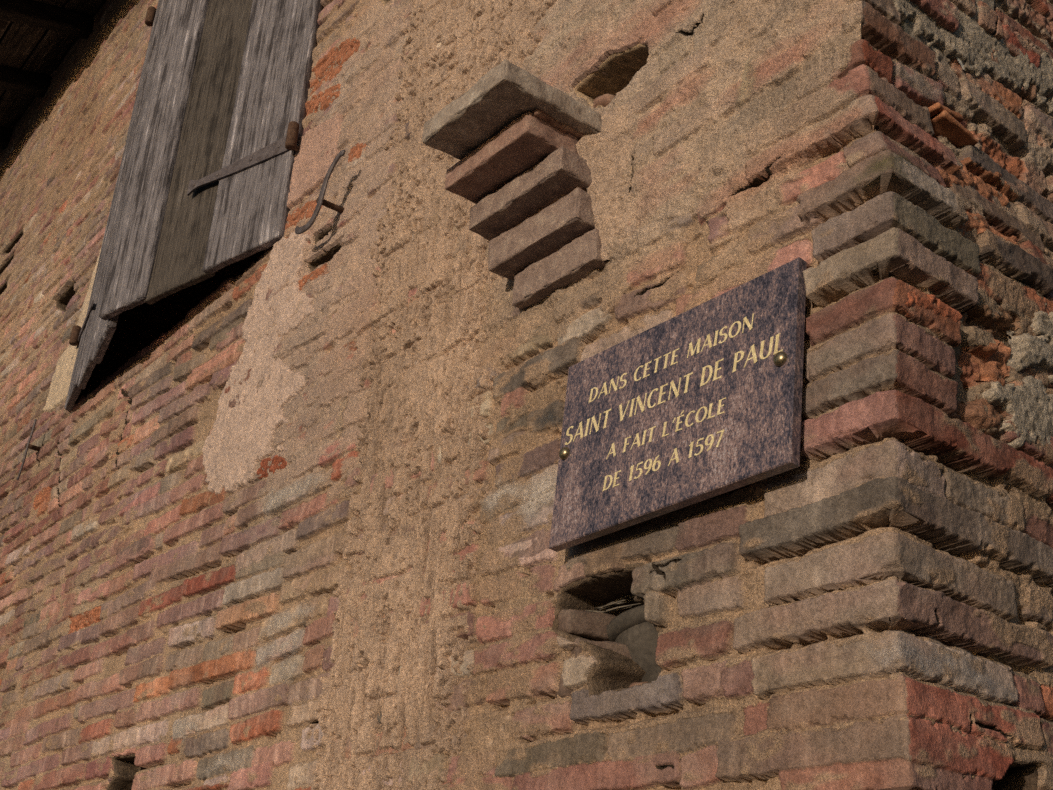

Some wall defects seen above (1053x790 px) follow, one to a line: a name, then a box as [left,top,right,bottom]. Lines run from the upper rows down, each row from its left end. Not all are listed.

crack [675,13,704,36]
crack [728,150,787,197]
spalling [256,455,287,479]